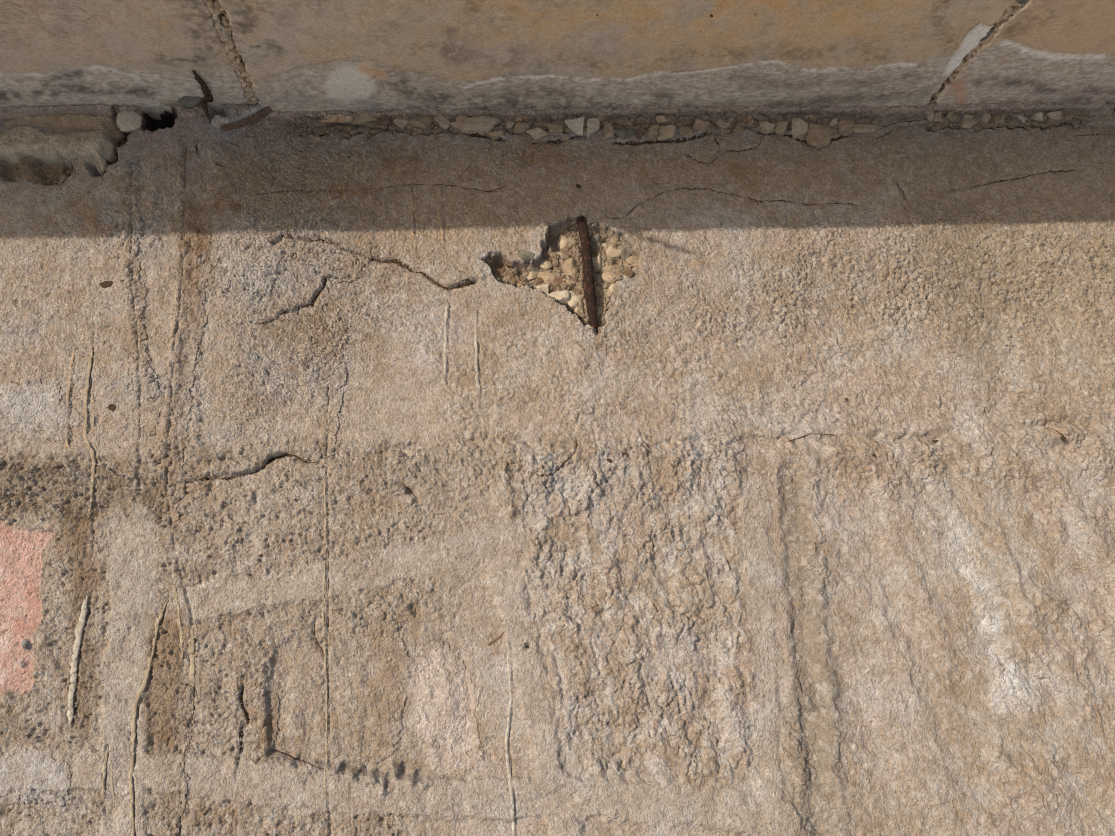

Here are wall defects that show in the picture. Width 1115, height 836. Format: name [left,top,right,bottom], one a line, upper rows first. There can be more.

peeling [211,104,273,132]
crack [533,136,585,144]
flaking render [0,157,74,184]
crack [256,133,508,208]
crack [609,119,926,219]
crack [258,277,327,324]
crack [372,258,477,291]
spalling [482,217,640,333]
rust [576,216,610,353]
crack [185,453,313,483]